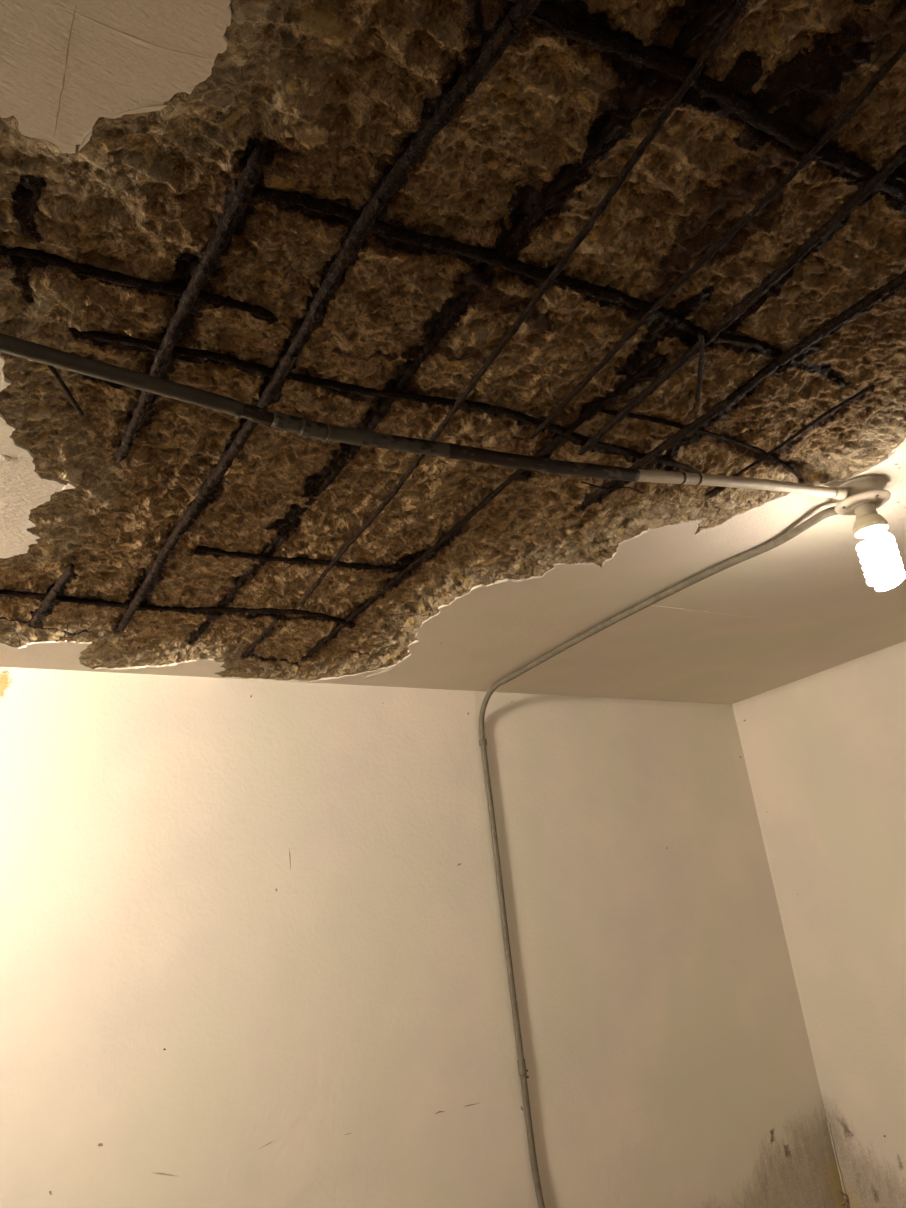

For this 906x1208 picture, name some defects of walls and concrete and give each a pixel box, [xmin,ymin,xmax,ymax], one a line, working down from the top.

rust [0,0,906,500]
spalling [0,0,906,681]
rust [0,442,467,668]
rust [573,481,632,513]
water stain [692,1094,906,1208]